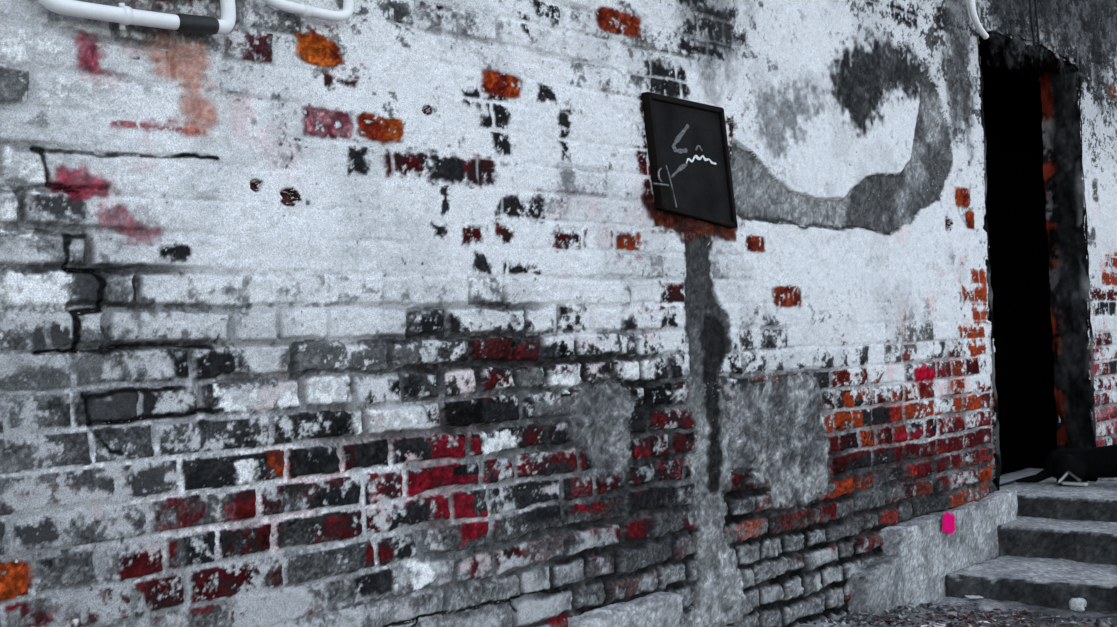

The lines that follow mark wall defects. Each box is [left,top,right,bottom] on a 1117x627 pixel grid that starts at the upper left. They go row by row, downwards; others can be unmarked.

peeling [596,7,642,38]
leakage [991,0,1117,107]
leakage [757,84,819,156]
crack [30,146,219,196]
crack [0,230,132,354]
crack [176,343,214,351]
crack [81,386,224,455]